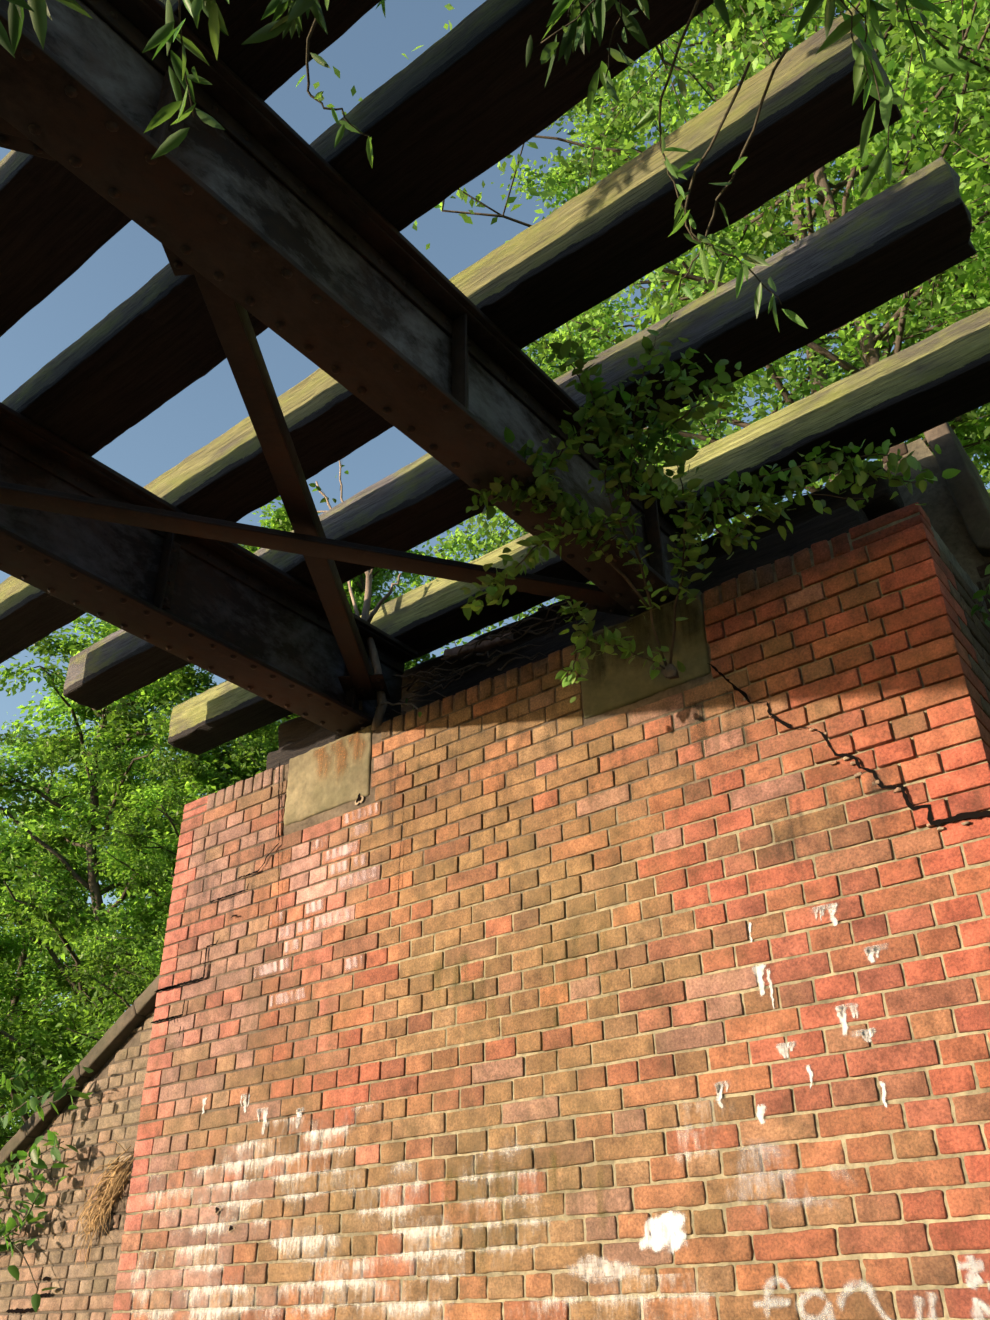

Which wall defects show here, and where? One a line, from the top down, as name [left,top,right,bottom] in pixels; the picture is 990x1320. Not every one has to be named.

crack [707,663,990,832]
crack [151,763,280,1035]
damp [815,903,838,926]
damp [753,964,774,1008]
damp [836,1005,875,1042]
damp [757,1105,765,1124]
damp [210,1094,348,1210]
damp [362,1205,461,1260]
damp [640,1211,686,1252]
damp [181,1223,248,1320]
damp [285,1260,385,1312]
damp [577,1255,638,1300]